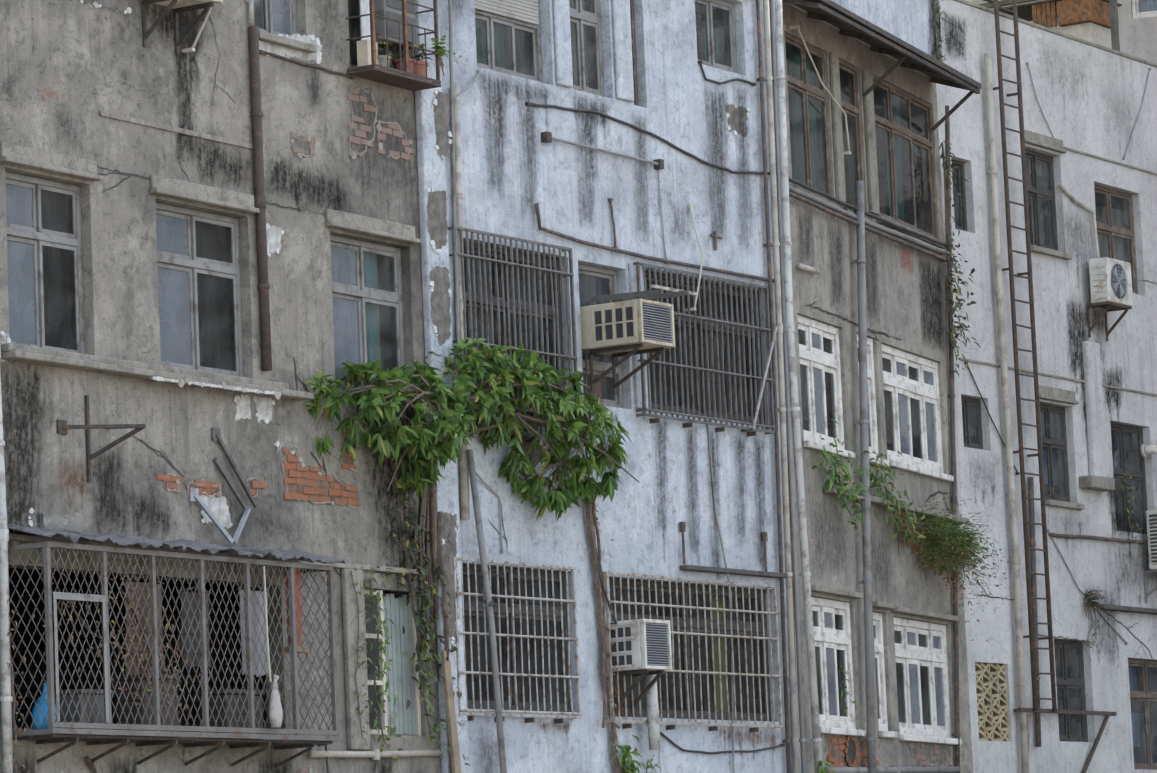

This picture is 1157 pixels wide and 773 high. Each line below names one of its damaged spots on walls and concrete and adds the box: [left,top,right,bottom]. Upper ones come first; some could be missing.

damp [146,5,248,181]
damp [271,160,346,211]
spalling [347,84,414,161]
damp [489,79,547,200]
damp [574,98,605,215]
damp [710,94,724,222]
damp [1068,303,1100,418]
peeling [157,472,233,529]
spalling [274,420,361,507]